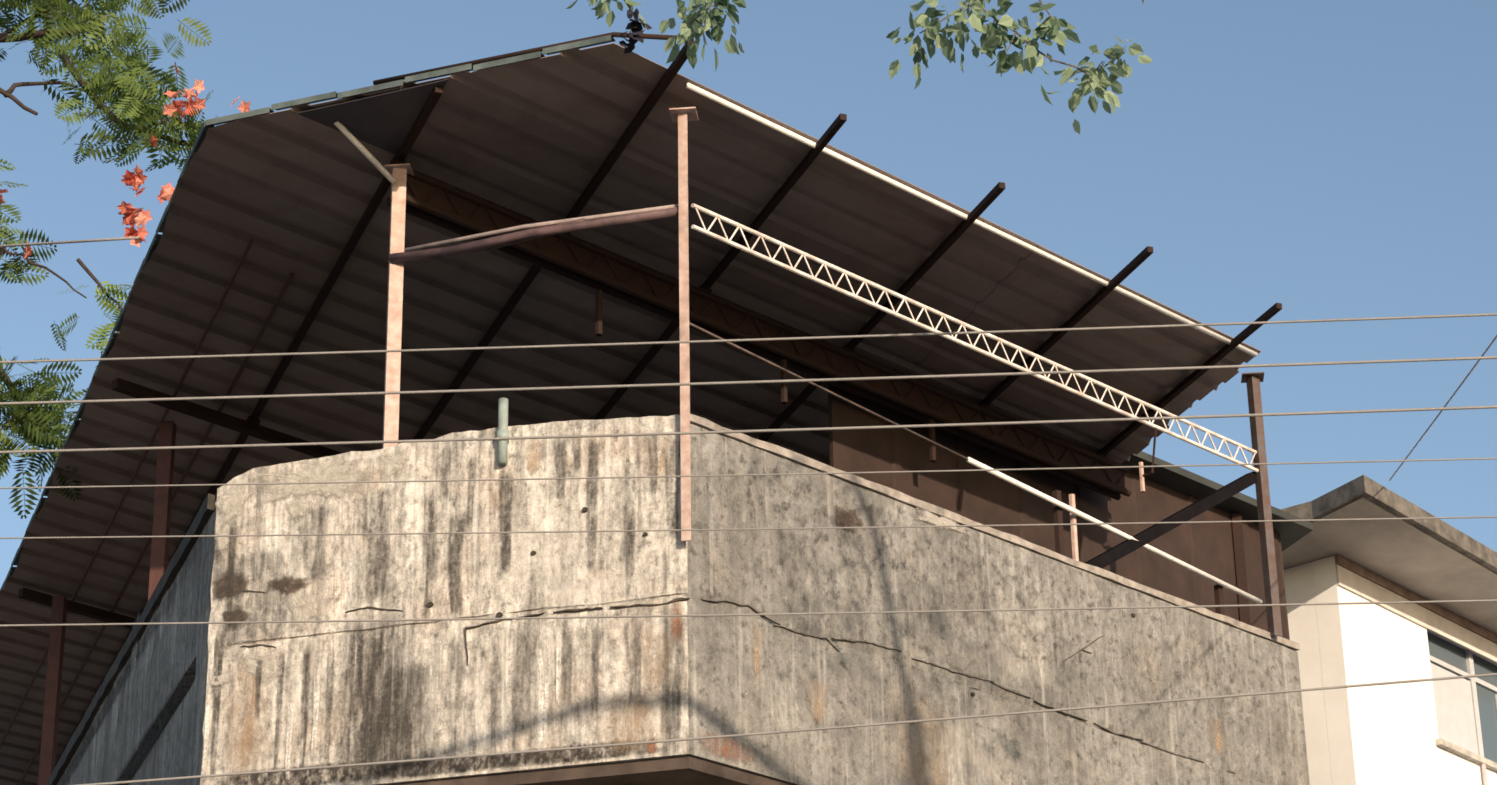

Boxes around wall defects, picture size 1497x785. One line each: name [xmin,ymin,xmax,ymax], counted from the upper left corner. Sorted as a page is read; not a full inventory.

damp [202,527,285,775]
crack [240,642,274,650]
damp [256,622,435,774]
crack [345,605,402,613]
damp [365,495,388,594]
damp [424,459,474,613]
damp [476,628,571,746]
damp [500,476,556,584]
damp [556,443,600,547]
damp [624,512,642,599]
damp [650,443,680,534]
crack [464,597,1204,763]